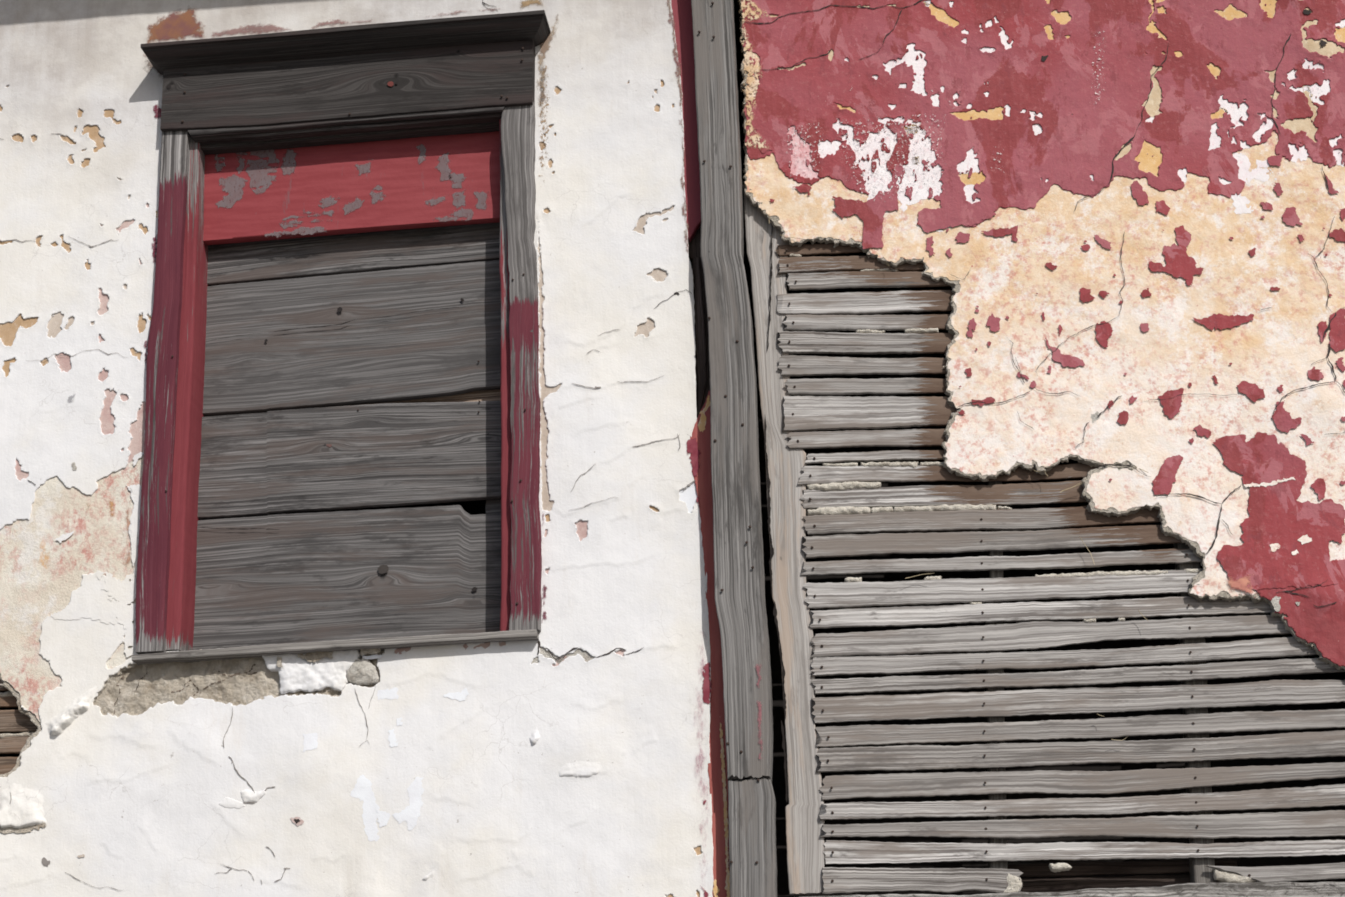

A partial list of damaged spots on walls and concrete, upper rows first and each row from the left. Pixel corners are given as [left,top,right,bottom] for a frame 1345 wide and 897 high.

crack [743,0,923,71]
peeling [12,134,37,142]
peeling [61,109,121,168]
peeling [0,312,74,377]
peeling [91,288,109,343]
peeling [137,313,151,333]
peeling [734,0,1345,897]
spalling [205,500,486,520]
peeling [0,369,411,722]
crack [531,641,644,667]
peeling [696,723,730,897]